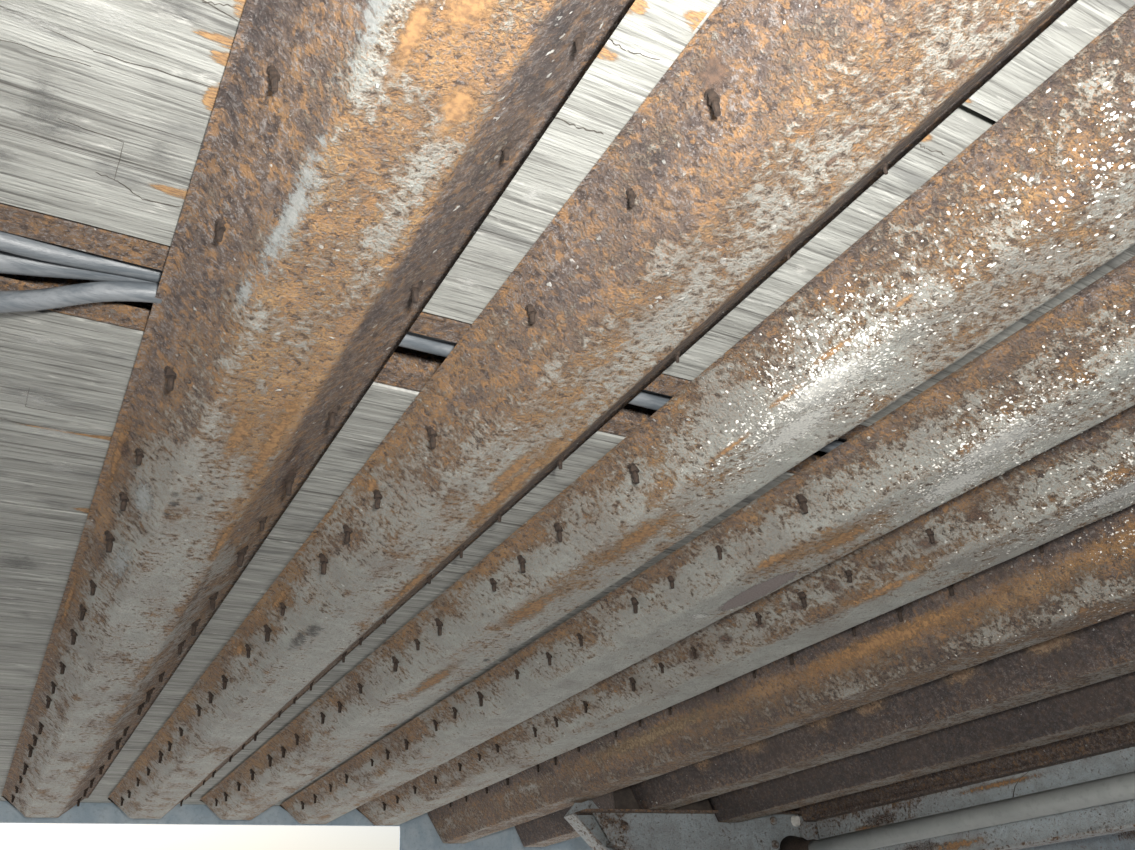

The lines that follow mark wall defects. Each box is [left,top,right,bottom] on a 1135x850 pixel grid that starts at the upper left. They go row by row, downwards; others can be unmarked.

rust [446,0,496,26]
rust [627,0,649,14]
rust [194,31,235,66]
rust [391,5,430,76]
rust [597,47,617,61]
rust [202,83,221,111]
rust [438,89,474,135]
rust [151,184,188,199]
rust [506,591,561,626]
rust [804,608,960,674]
rust [409,665,455,697]
rust [905,838,984,850]